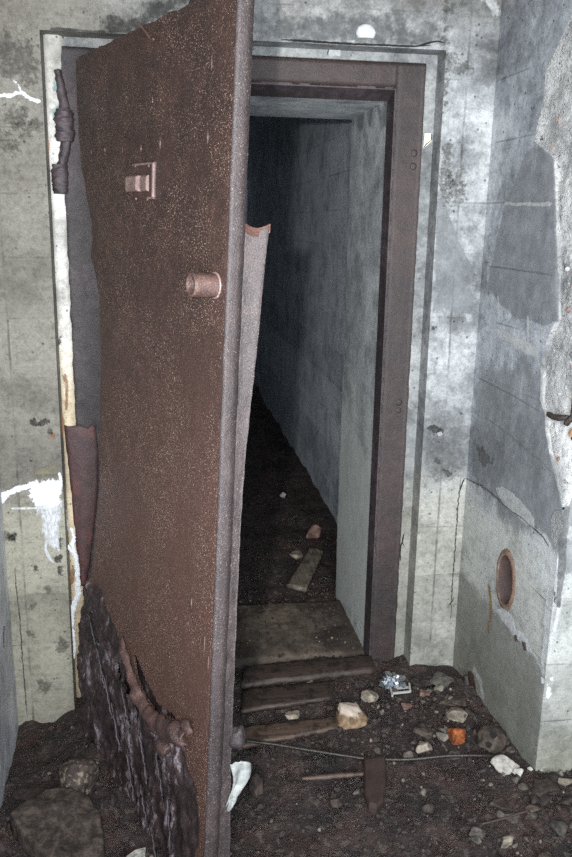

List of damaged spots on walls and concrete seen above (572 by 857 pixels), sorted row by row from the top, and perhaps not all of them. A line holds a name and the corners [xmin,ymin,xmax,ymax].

crack [0,81,41,103]
spalling [535,15,572,608]
damp [1,465,63,562]
crack [449,478,549,619]